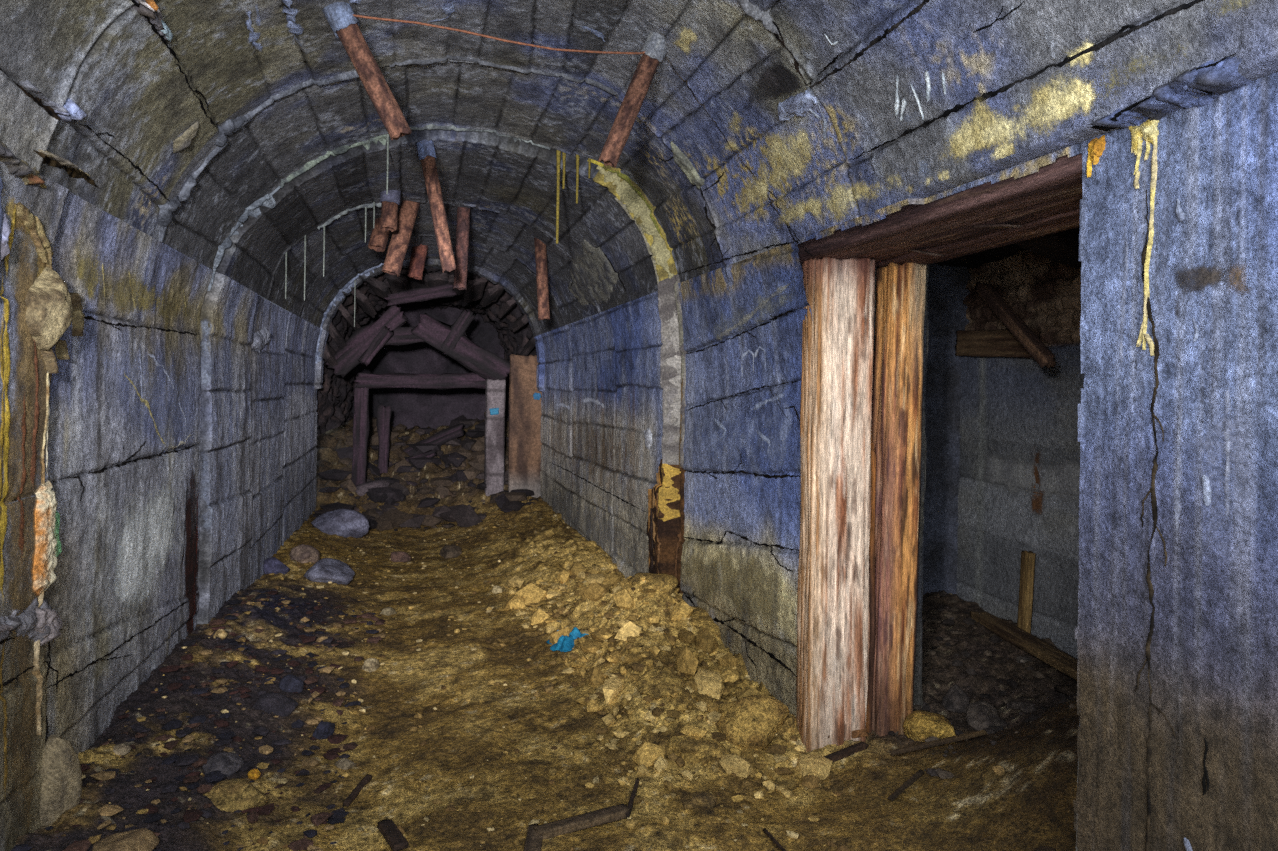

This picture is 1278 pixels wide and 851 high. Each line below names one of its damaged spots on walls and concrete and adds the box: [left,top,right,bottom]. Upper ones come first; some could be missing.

crack [974,1,1024,32]
leakage [1070,43,1093,64]
spalling [0,142,47,262]
peeling [19,80,87,121]
peeling [38,149,90,176]
leakage [740,132,811,212]
leakage [950,80,1096,158]
leakage [1086,135,1106,177]
leakage [1120,119,1159,360]
leakage [591,159,688,469]
leakage [0,199,62,827]
crack [1135,190,1209,851]